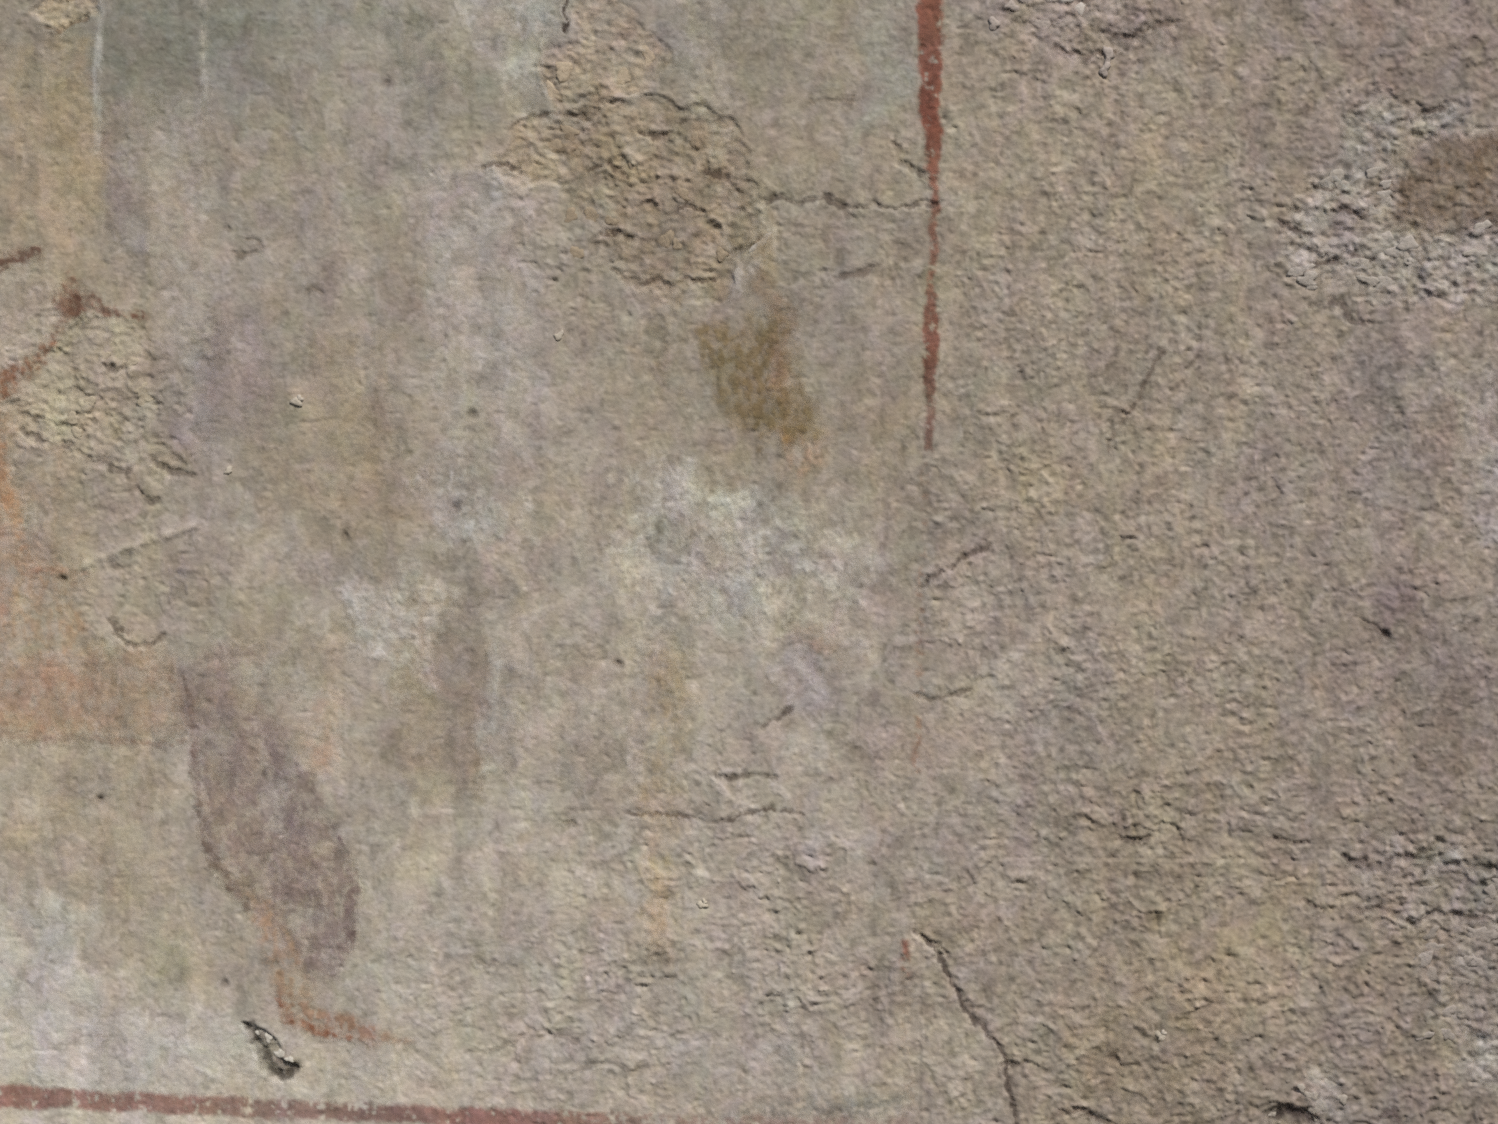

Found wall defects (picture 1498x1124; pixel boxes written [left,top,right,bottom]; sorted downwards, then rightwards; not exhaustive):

flaking render [38,0,95,30]
crack [561,0,569,32]
flaking render [544,46,588,101]
flaking render [628,226,772,289]
leakage [697,315,815,442]
flaking render [255,1030,294,1071]
crack [913,930,1016,1116]